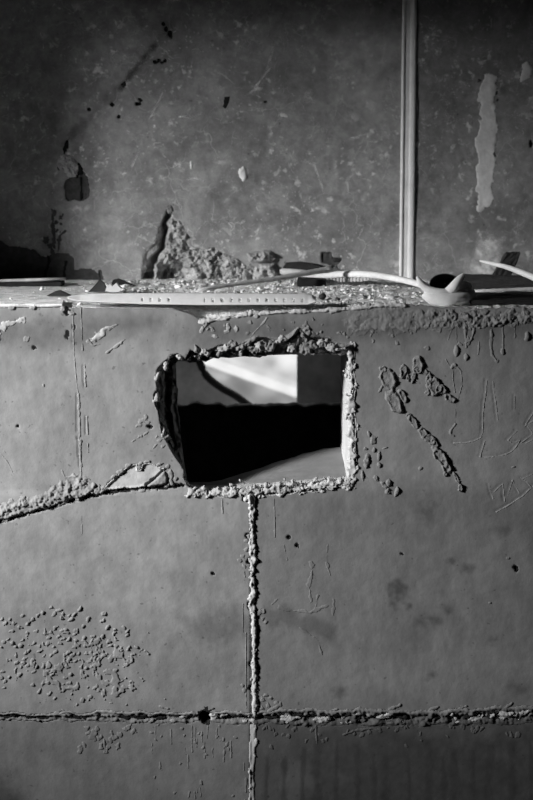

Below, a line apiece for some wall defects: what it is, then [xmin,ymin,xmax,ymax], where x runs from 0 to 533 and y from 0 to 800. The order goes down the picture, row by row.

peeling [57,134,90,201]
spalling [0,205,281,286]
spalling [86,301,416,502]